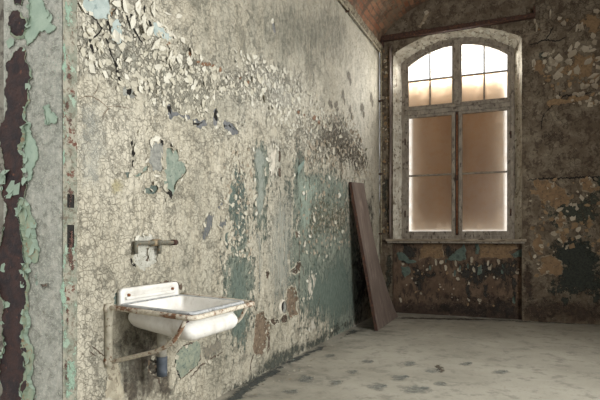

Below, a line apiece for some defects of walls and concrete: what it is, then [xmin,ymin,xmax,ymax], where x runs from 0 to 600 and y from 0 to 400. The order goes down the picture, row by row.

rust [0,0,35,400]
peeling [19,309,36,400]
crack [79,84,128,120]
peeling [123,128,188,201]
peeling [65,0,331,136]
peeling [202,143,281,300]
peeling [227,160,354,370]
leakage [230,230,370,391]
leakage [304,90,373,183]
leakage [431,237,600,321]
peeling [529,176,600,277]
peeling [532,9,600,108]